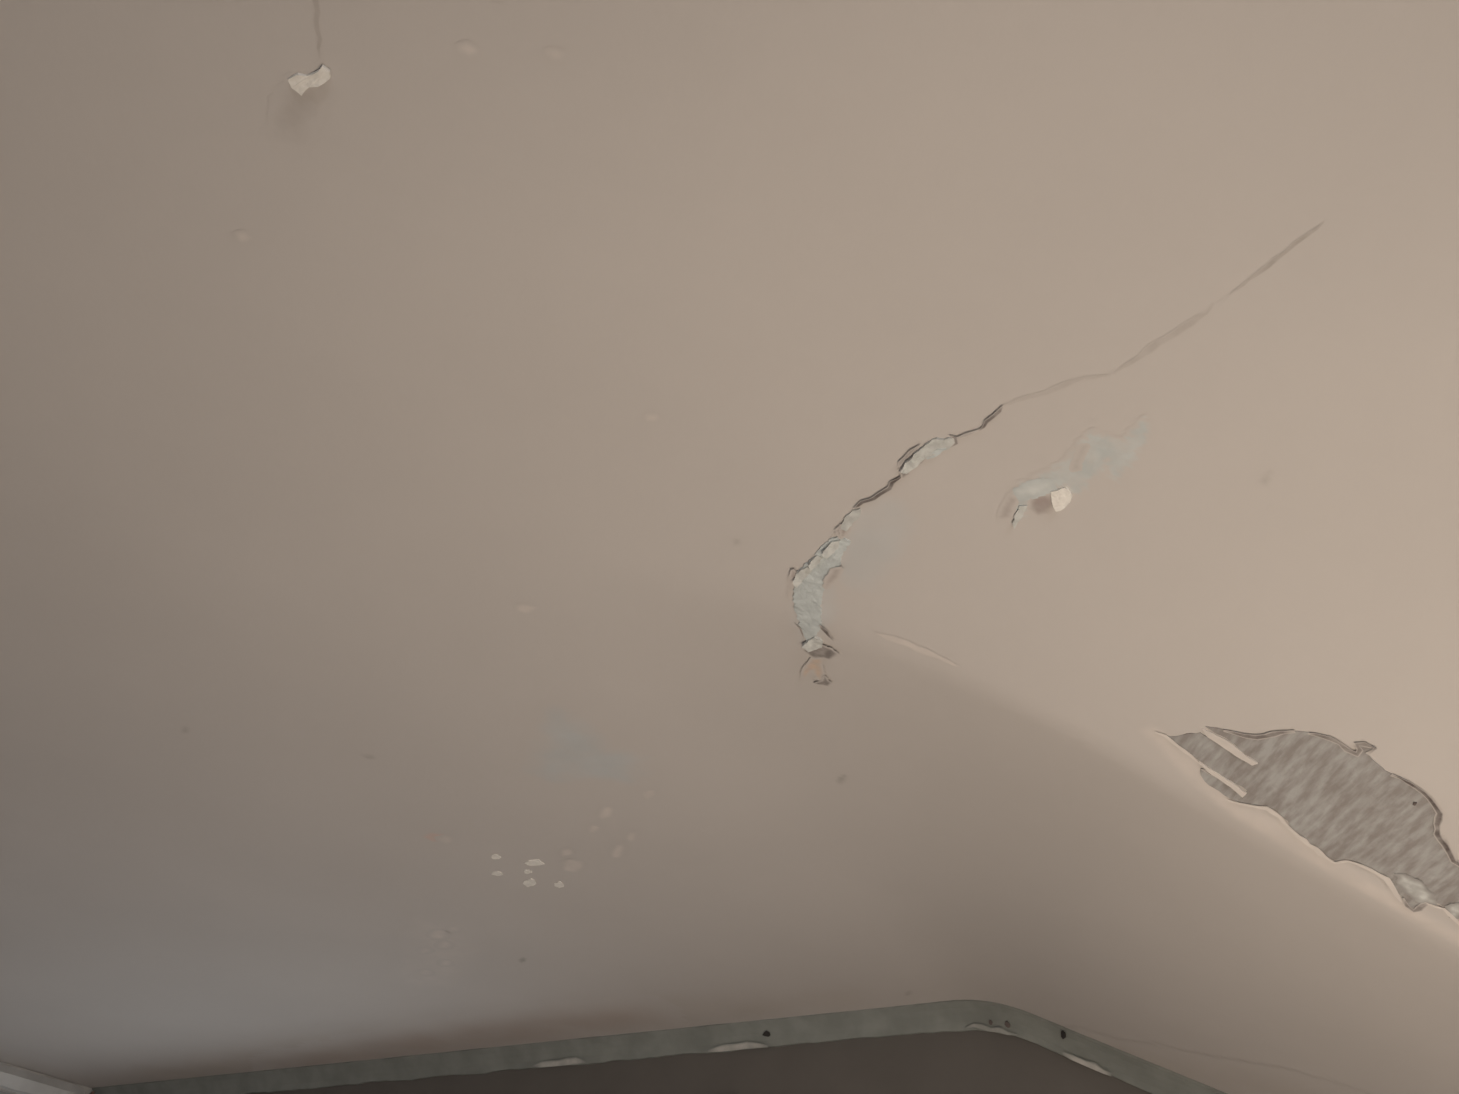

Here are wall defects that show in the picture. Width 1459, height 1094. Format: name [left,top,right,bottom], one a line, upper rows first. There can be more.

peeling [1012,478,1072,529]
crack [782,222,1325,686]
peeling [1134,721,1459,949]